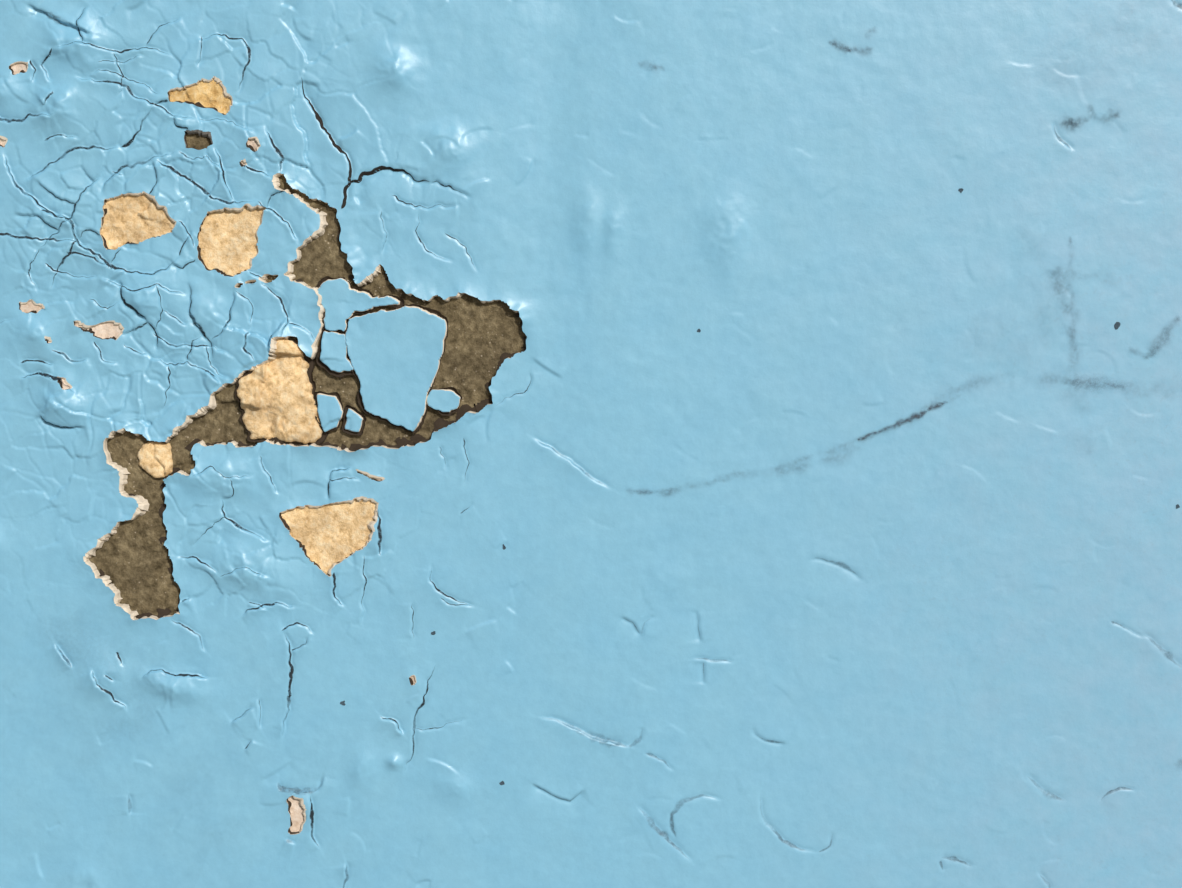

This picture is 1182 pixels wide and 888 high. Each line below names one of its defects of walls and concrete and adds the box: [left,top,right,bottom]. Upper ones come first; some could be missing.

peeling [167,76,233,115]
crack [0,14,299,403]
crack [302,81,473,264]
peeling [73,320,124,340]
spalling [83,173,527,620]
crack [333,515,382,604]
crack [431,571,464,605]
peeling [286,795,306,835]